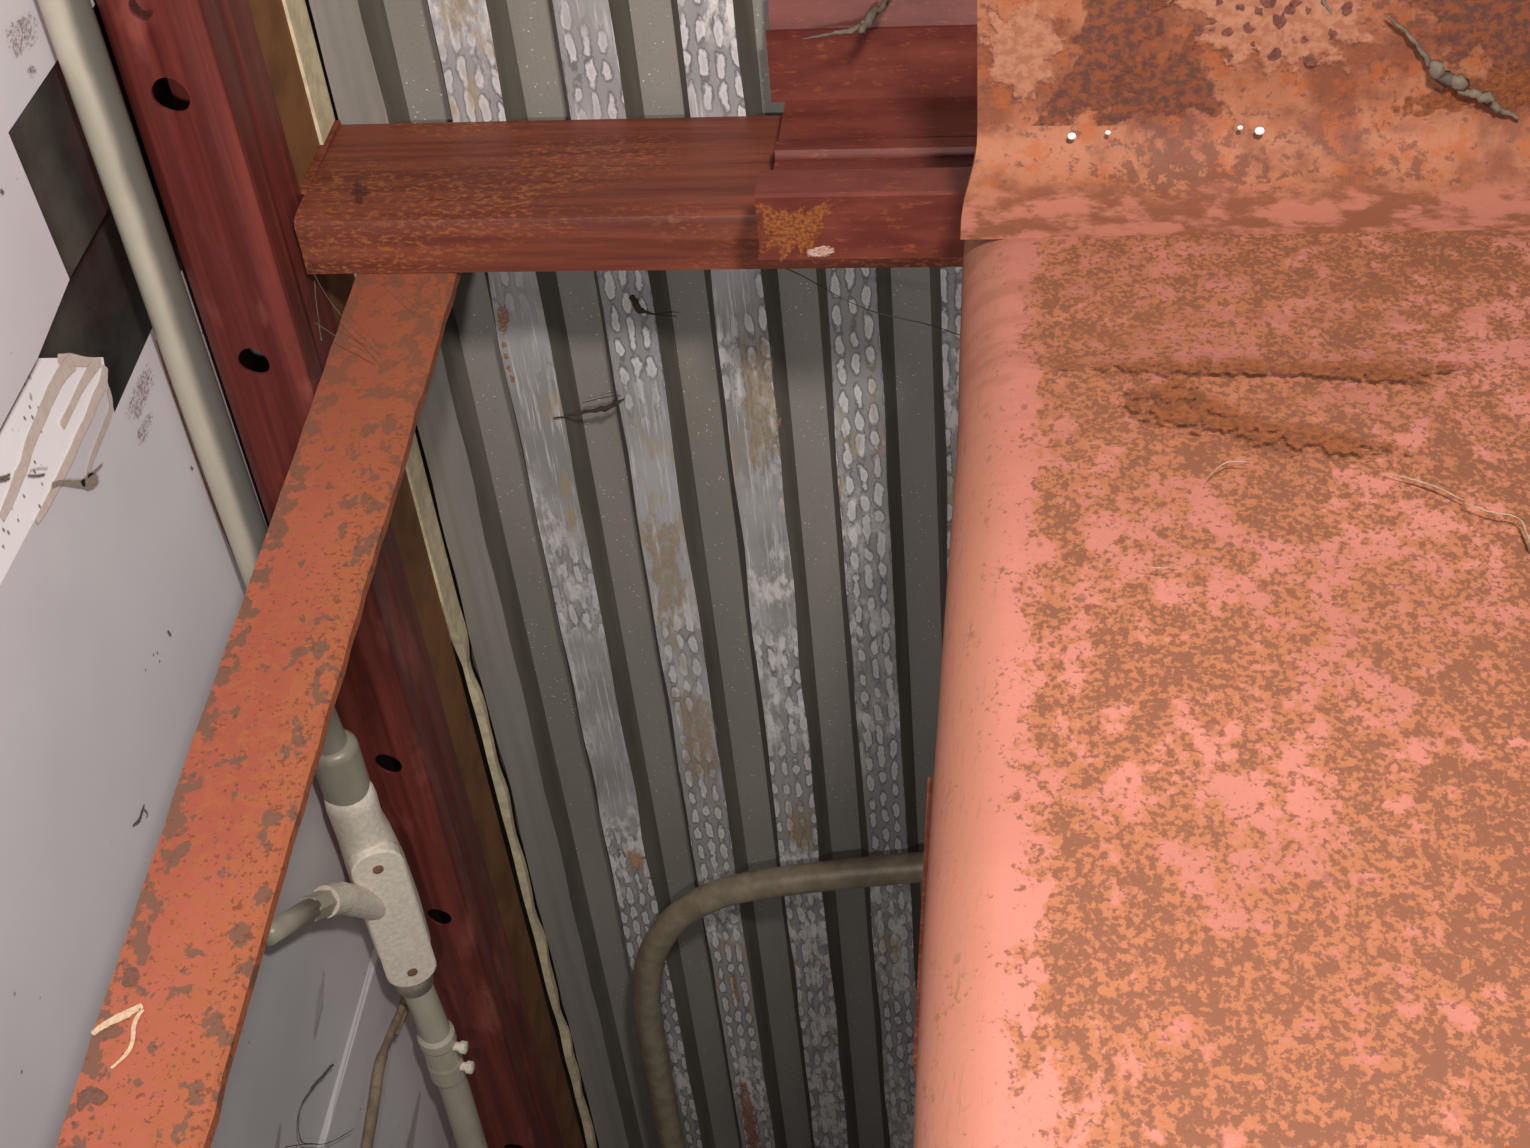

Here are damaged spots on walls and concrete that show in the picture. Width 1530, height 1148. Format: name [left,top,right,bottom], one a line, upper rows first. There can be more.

corrosion [1034,0,1229,126]
corrosion [1393,0,1530,116]
corrosion [756,198,834,262]
corrosion [156,340,237,563]
corrosion [1063,356,1475,456]